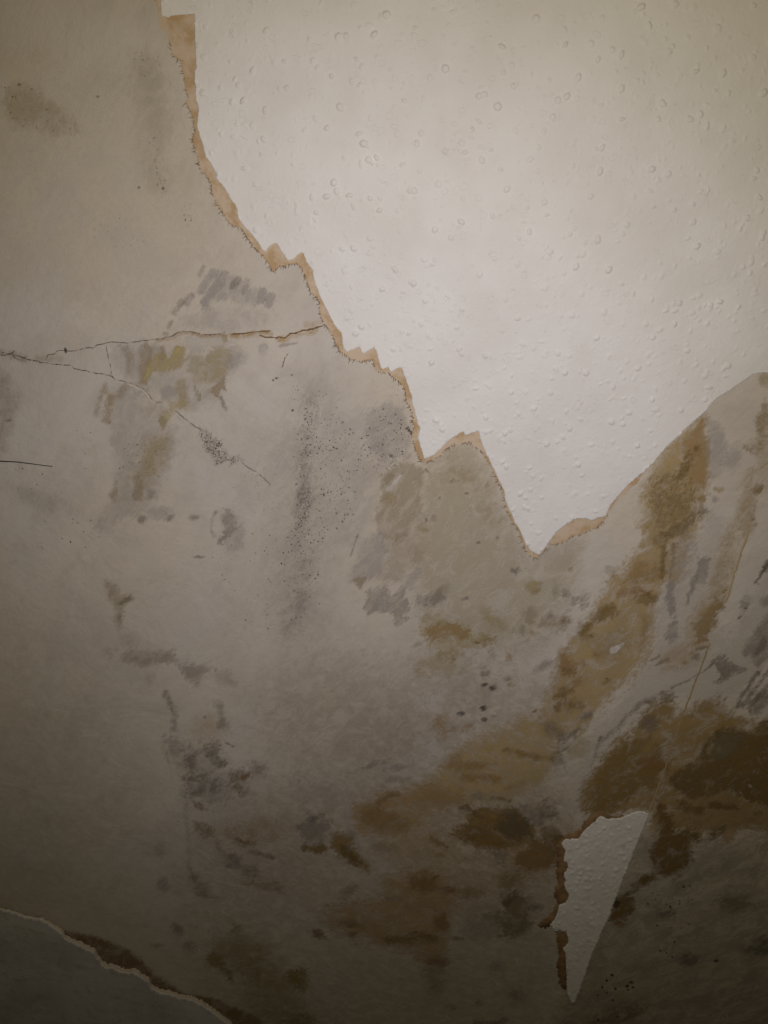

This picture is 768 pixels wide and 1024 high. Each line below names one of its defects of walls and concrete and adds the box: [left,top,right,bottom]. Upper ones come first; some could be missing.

crack [0,325,323,430]
spalling [201,431,241,465]
water stain [685,589,726,664]
water stain [298,418,711,966]
water stain [561,686,768,1024]